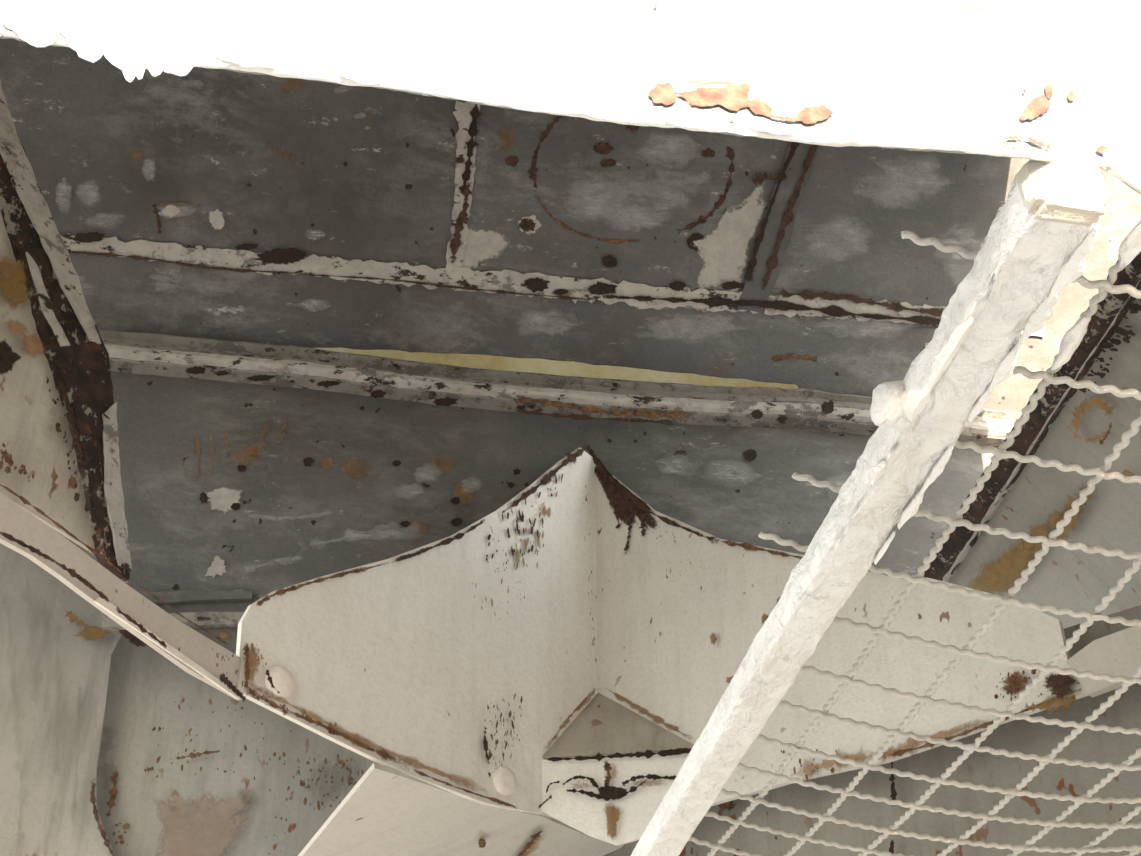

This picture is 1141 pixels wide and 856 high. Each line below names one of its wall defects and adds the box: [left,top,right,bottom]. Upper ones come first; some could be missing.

rust [450,104,482,263]
peeling [461,228,509,268]
rust [68,142,944,326]
rust [502,115,639,268]
peeling [693,185,766,292]
rust [0,334,51,375]
rust [1079,299,1141,393]
rust [46,366,91,512]
rust [257,445,802,620]
rust [782,669,1083,780]
rust [90,770,130,856]